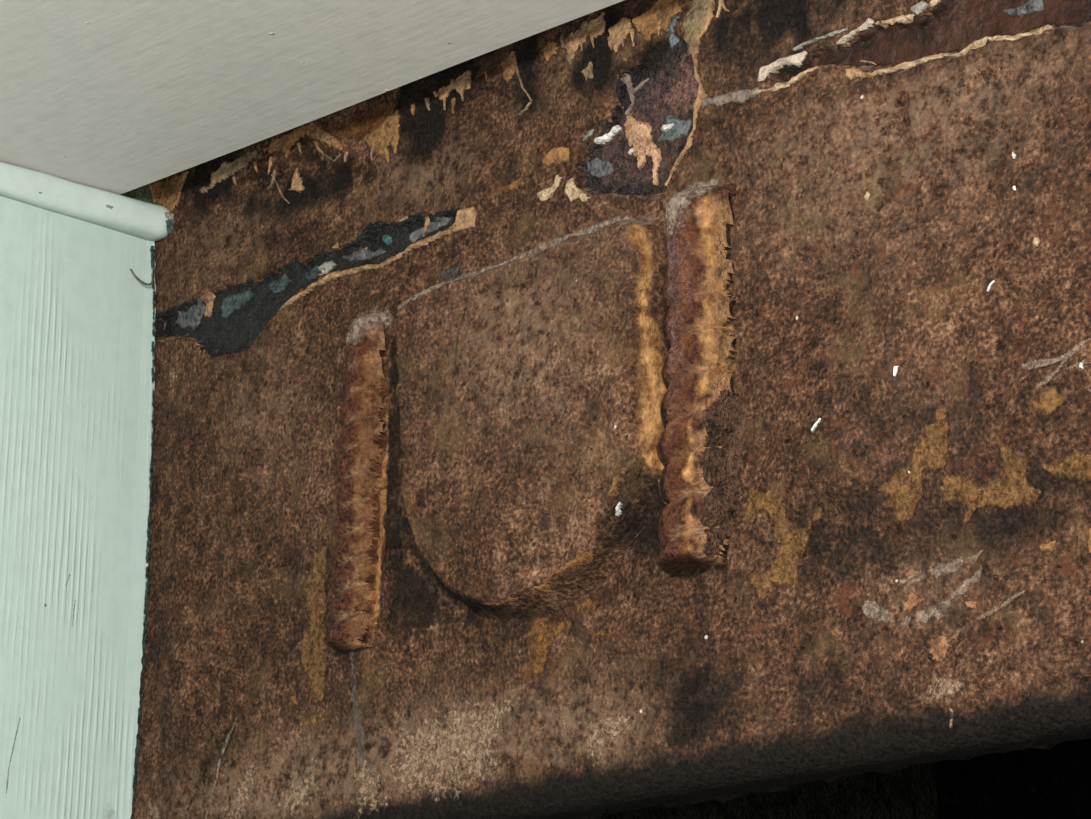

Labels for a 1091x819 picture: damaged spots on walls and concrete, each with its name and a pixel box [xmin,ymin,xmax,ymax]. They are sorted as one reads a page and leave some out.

peeling [411,70,488,115]
peeling [501,51,532,116]
peeling [537,0,730,202]
peeling [753,0,1091,93]
peeling [158,170,189,234]
peeling [199,121,348,204]
peeling [498,179,525,194]
rust [699,198,731,395]
rust [683,421,694,498]
peeling [132,206,478,817]
rust [363,404,389,635]